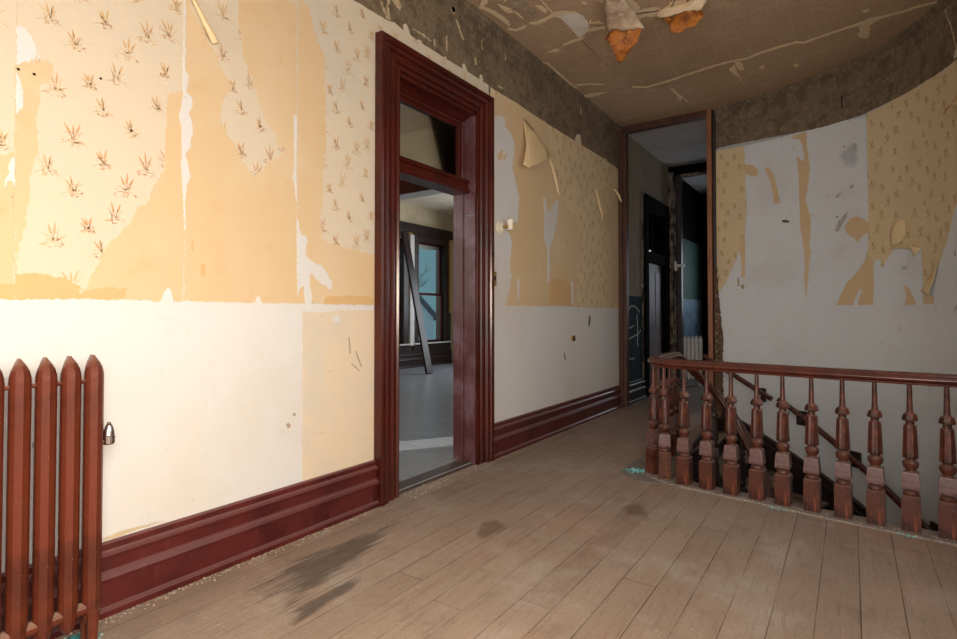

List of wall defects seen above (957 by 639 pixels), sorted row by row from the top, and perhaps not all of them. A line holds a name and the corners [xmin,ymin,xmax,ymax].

peeling [479,0,606,52]
flaking render [15,26,40,114]
flaking render [179,0,194,230]
flaking render [4,158,16,187]
flaking render [160,288,174,303]
flaking render [296,219,333,305]
flaking render [494,115,520,307]
flaking render [543,197,559,282]
flaking render [714,116,957,418]